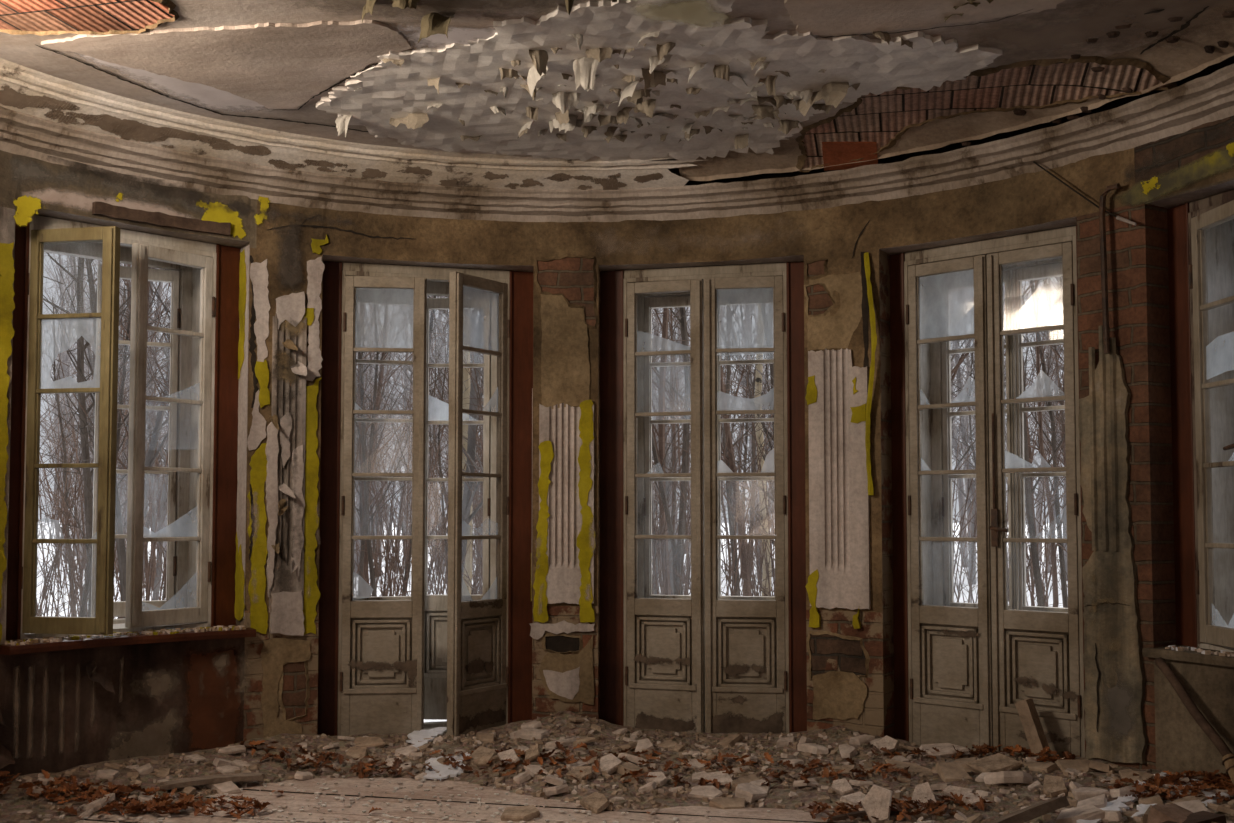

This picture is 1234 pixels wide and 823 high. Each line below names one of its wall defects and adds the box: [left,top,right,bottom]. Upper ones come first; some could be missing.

flaking render [1204,41,1229,54]
damp [84,55,265,110]
peeling [0,0,1180,190]
peeling [13,195,45,227]
damp [11,156,208,213]
peeling [1141,176,1161,195]
damp [1119,148,1234,206]
peeling [196,196,329,636]
peeling [805,375,818,405]
peeling [850,252,877,495]
peeling [530,388,596,700]
flaking render [805,570,870,681]